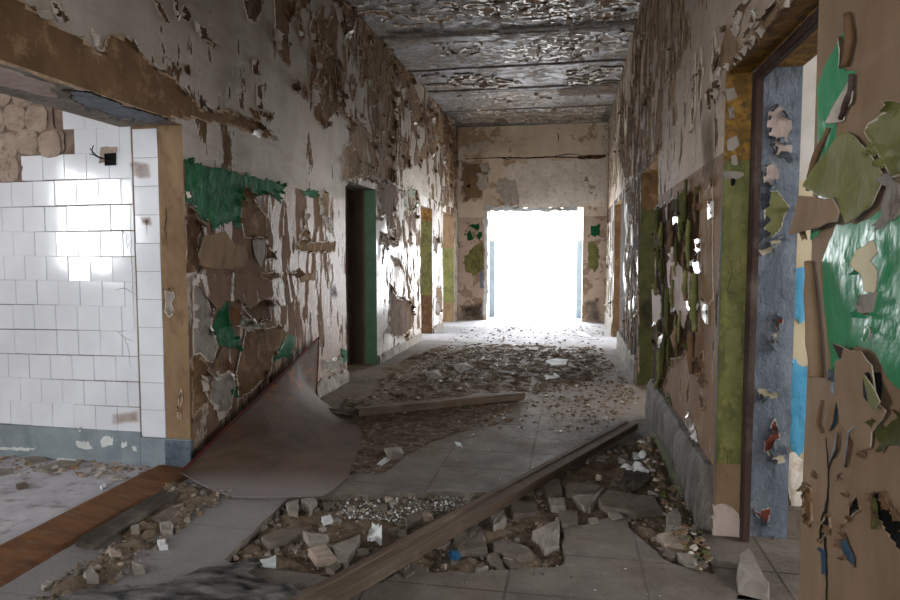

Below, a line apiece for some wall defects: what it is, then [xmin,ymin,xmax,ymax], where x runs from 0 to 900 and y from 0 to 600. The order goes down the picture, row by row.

peeling [0,93,65,183]
peeling [0,0,279,144]
crack [466,133,588,160]
peeling [759,12,893,256]
peeling [879,101,900,118]
peeling [243,0,793,412]
peeling [176,172,316,423]
peeling [763,214,900,497]
peeling [76,427,137,451]
peeling [683,411,698,442]
peeling [796,470,830,528]
peeling [864,490,900,532]